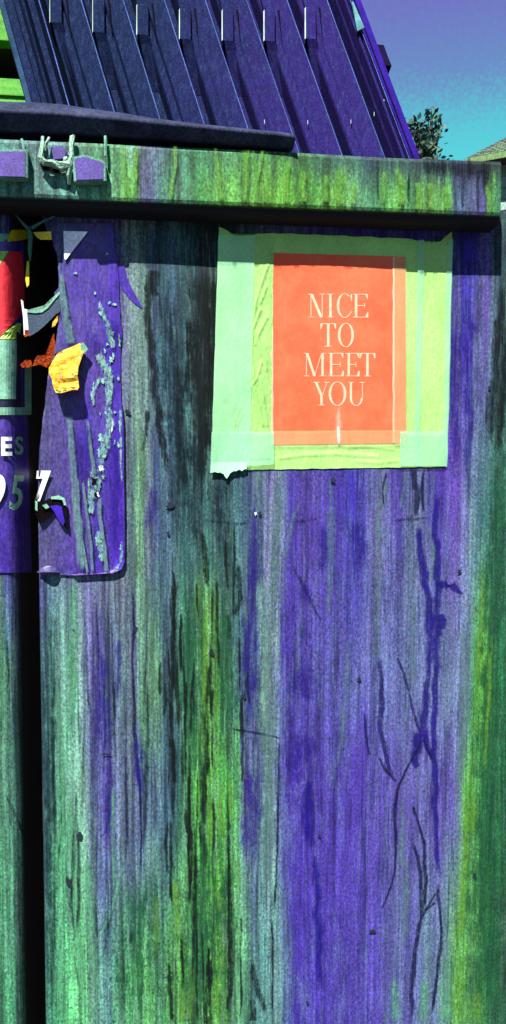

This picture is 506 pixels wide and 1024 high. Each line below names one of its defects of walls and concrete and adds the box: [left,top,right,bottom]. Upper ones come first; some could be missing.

peeling [88,292,131,513]
crack [364,499,462,1013]